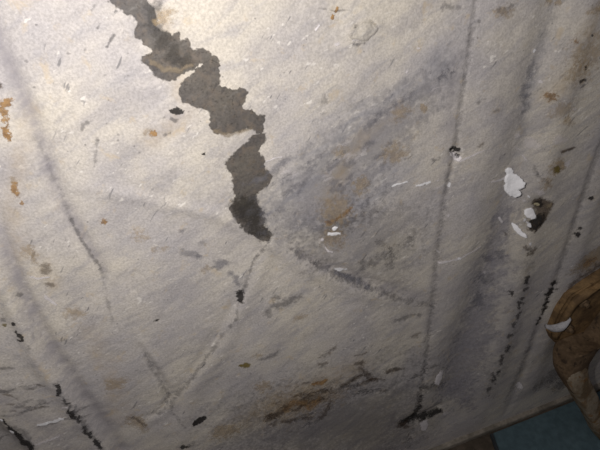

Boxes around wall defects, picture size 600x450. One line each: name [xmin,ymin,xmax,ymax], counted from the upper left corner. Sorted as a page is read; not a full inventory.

rust [0,98,12,141]
leakage [110,0,272,241]
spalling [449,146,481,162]
peeling [491,168,553,245]
crack [236,290,244,303]